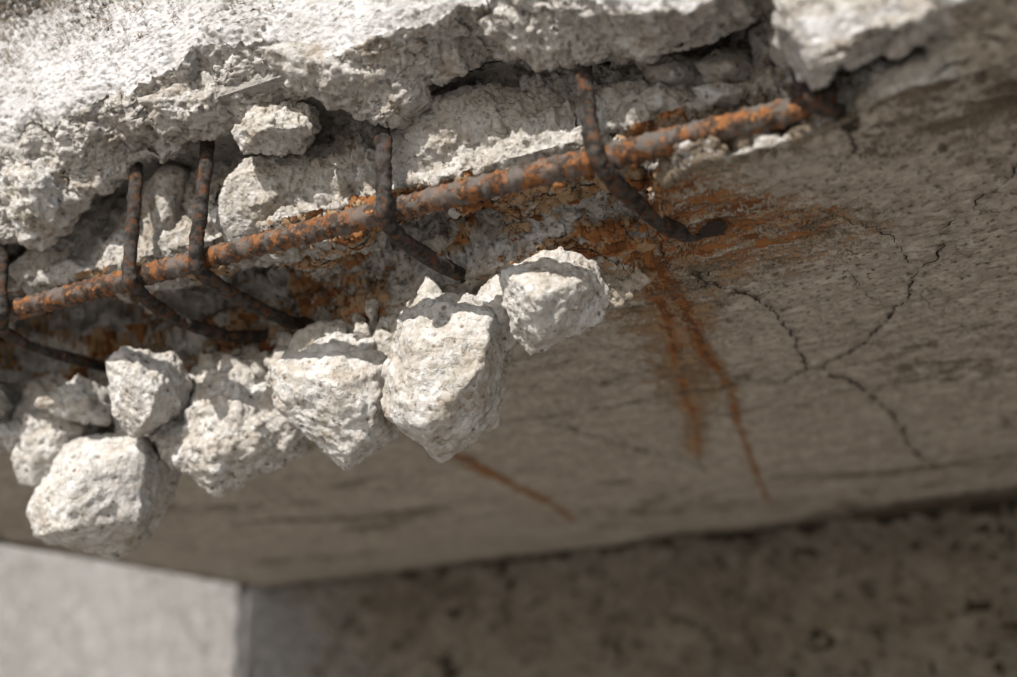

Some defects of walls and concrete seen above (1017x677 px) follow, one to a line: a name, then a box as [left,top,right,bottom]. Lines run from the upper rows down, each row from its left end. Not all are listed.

corrosion [0,291,175,383]
spalling [0,276,244,396]
spalling [0,39,311,301]
corrosion [184,305,299,371]
corrosion [256,193,376,233]
corrosion [254,226,398,327]
corrosion [392,169,474,198]
spalling [219,173,671,323]
spalling [255,0,959,233]
corrosion [616,106,688,140]
corrosion [439,152,894,503]
crack [502,165,1017,482]